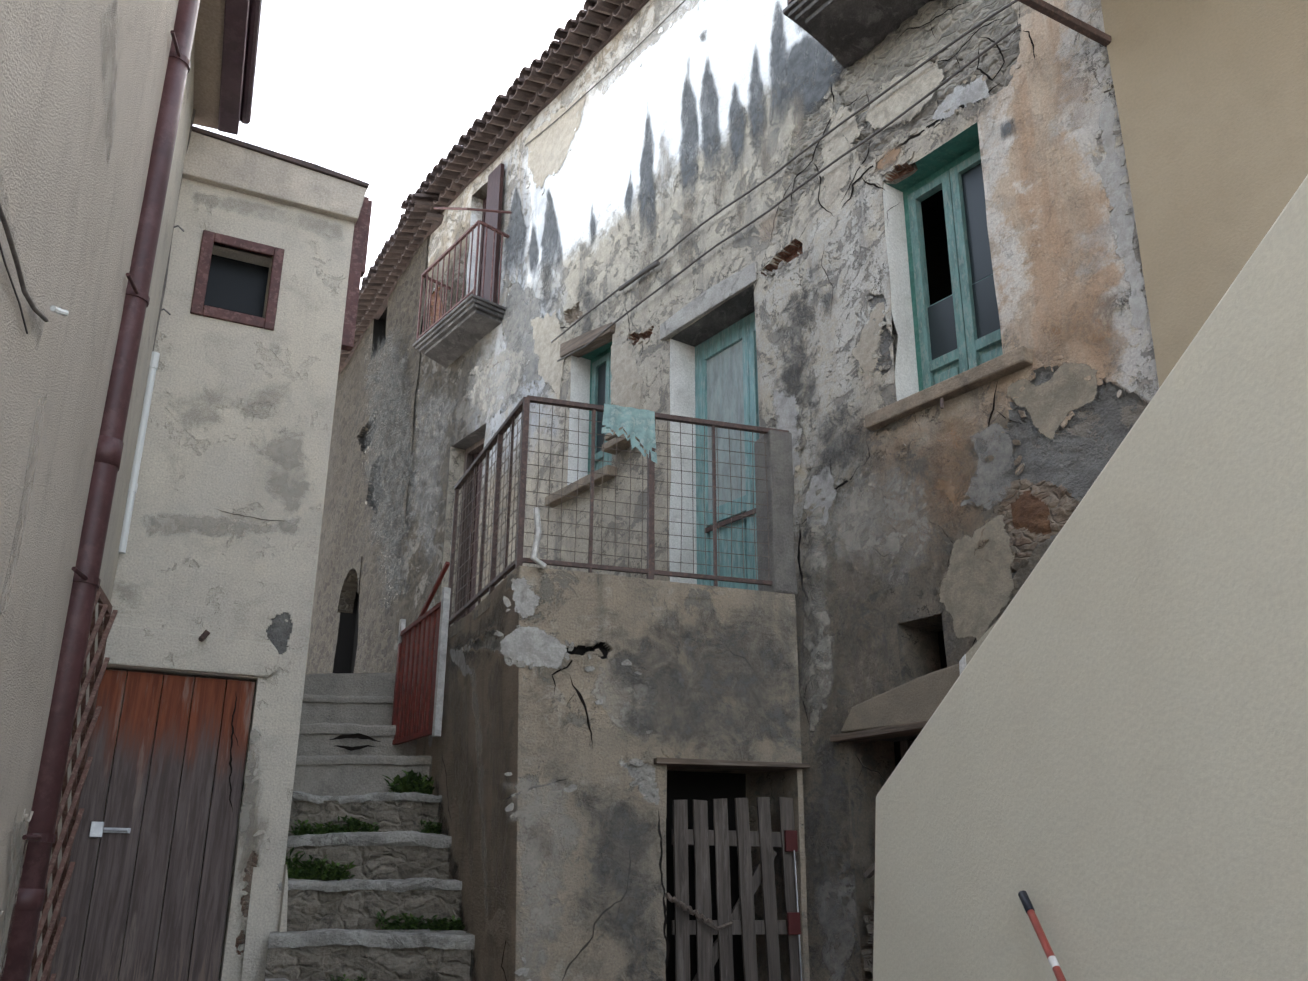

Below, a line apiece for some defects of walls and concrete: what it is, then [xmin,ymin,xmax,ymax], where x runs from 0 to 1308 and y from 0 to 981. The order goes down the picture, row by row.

damp [504,188,562,311]
damp [578,276,598,333]
damp [625,3,841,297]
flaking render [755,0,1034,288]
flaking render [1095,60,1148,330]
flaking render [768,389,841,535]
flaking render [938,352,1158,641]
flaking render [253,601,301,668]
flaking render [461,577,672,820]
crack [552,647,593,748]
crack [562,810,670,981]